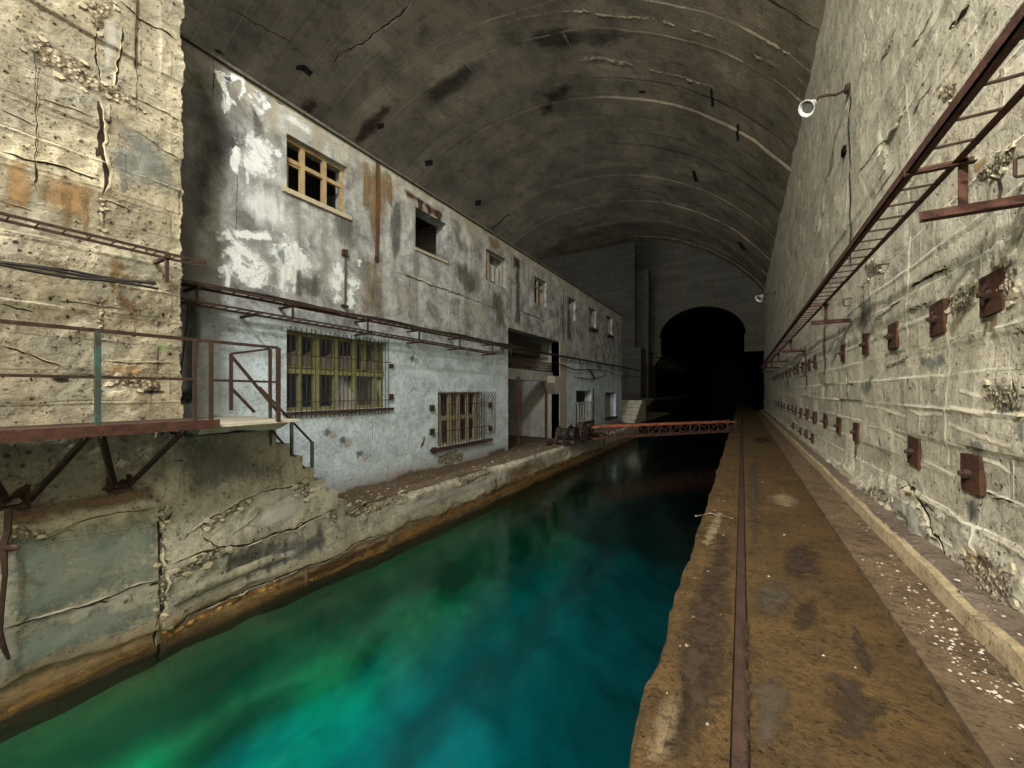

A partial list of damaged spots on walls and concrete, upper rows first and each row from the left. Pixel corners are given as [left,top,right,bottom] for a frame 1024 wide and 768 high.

crack [334,1,411,62]
crack [0,0,179,211]
peeling [219,72,282,105]
peeling [230,146,241,175]
peeling [252,138,283,167]
rust [8,164,89,232]
rust [364,162,392,263]
peeling [217,228,290,289]
crack [900,480,945,554]
crack [3,464,391,646]